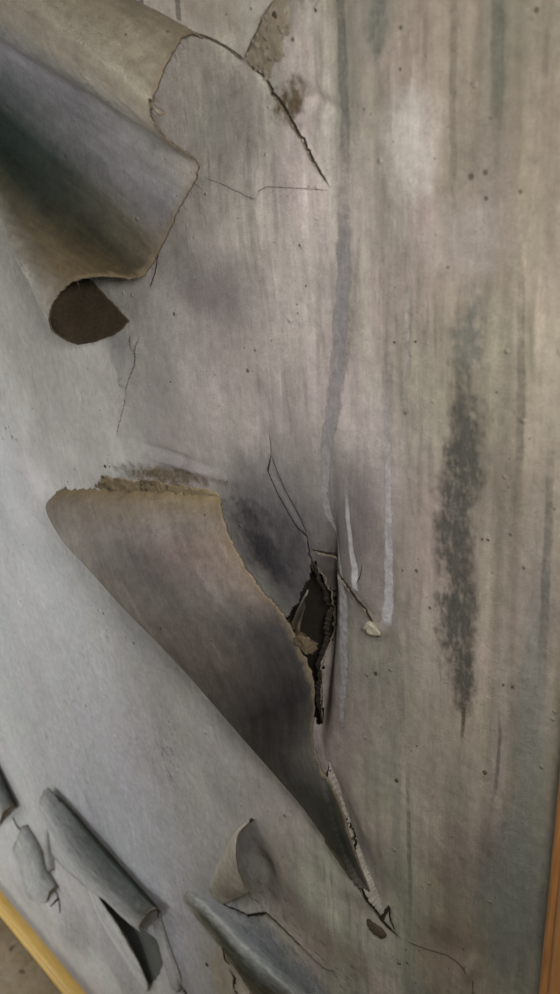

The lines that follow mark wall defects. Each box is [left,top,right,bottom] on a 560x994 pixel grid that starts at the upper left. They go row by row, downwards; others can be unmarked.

peeling [245,0,291,81]
peeling [94,465,220,497]
crack [267,429,315,573]
damp [435,396,482,708]
peeling [100,898,163,986]
peeling [205,946,251,994]